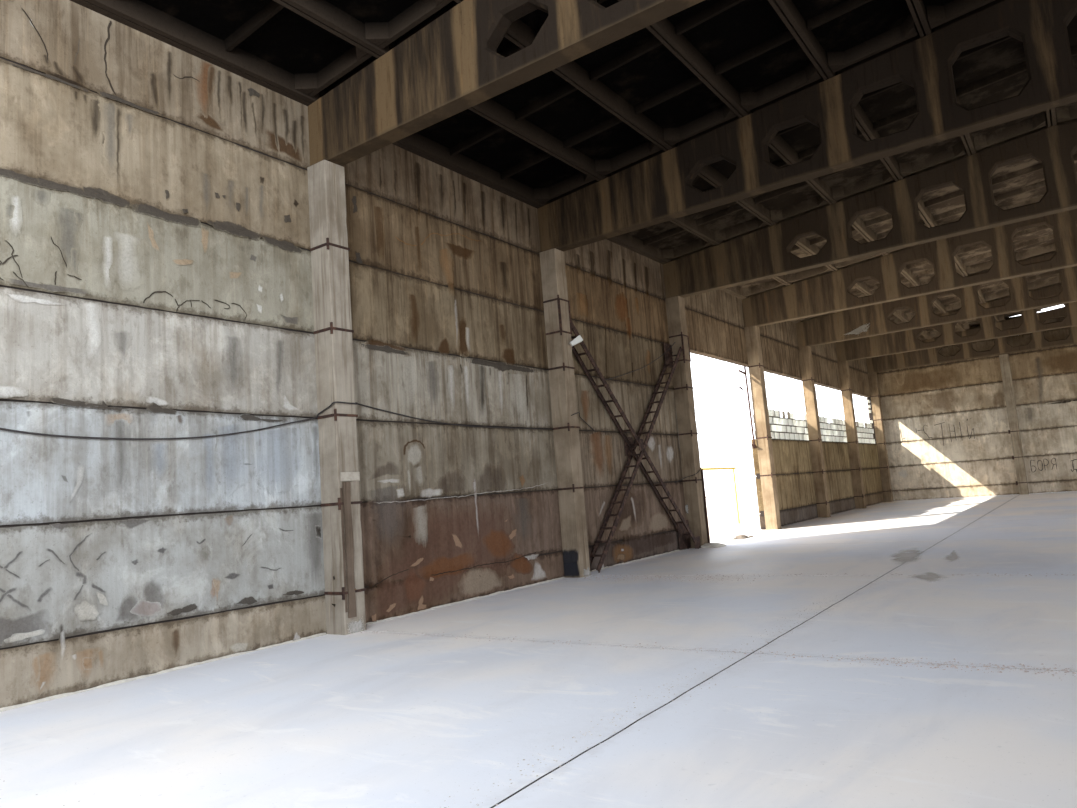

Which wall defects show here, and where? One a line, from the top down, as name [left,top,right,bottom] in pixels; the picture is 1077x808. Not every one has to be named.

crack [21,7,48,61]
crack [74,20,117,96]
corrosion [193,61,218,119]
crack [0,236,82,288]
crack [143,291,247,319]
leakage [0,385,29,399]
leakage [145,396,169,406]
leakage [104,413,134,502]
leakage [201,423,320,501]
crack [0,533,107,611]
corrosion [355,501,533,620]